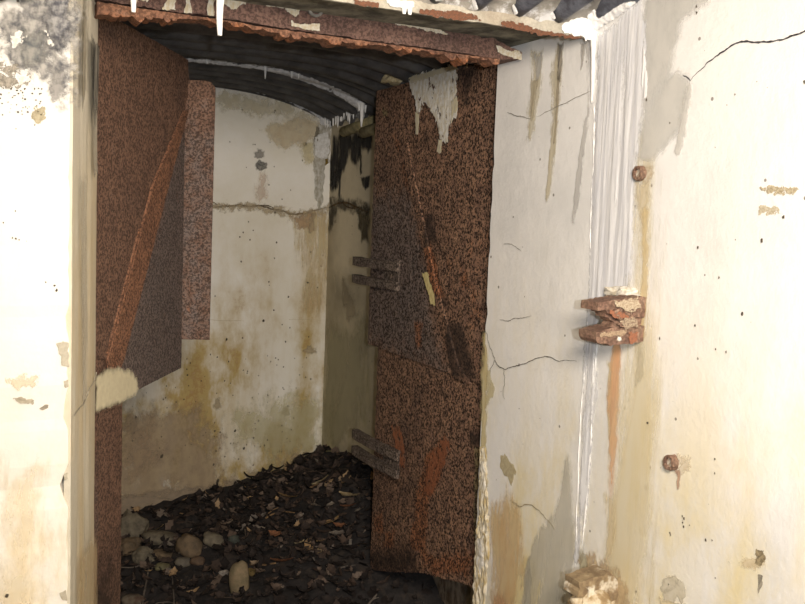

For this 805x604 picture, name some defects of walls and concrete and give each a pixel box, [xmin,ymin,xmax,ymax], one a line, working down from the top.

rust [354,0,379,8]
leakage [386,0,414,15]
rust [419,9,481,21]
crack [683,30,805,81]
leakage [0,0,99,176]
leakage [409,63,468,154]
crack [213,197,370,230]
rust [610,308,638,344]
leakage [546,0,706,604]
crack [485,330,574,397]
rust [607,345,621,477]
leakage [743,549,766,593]